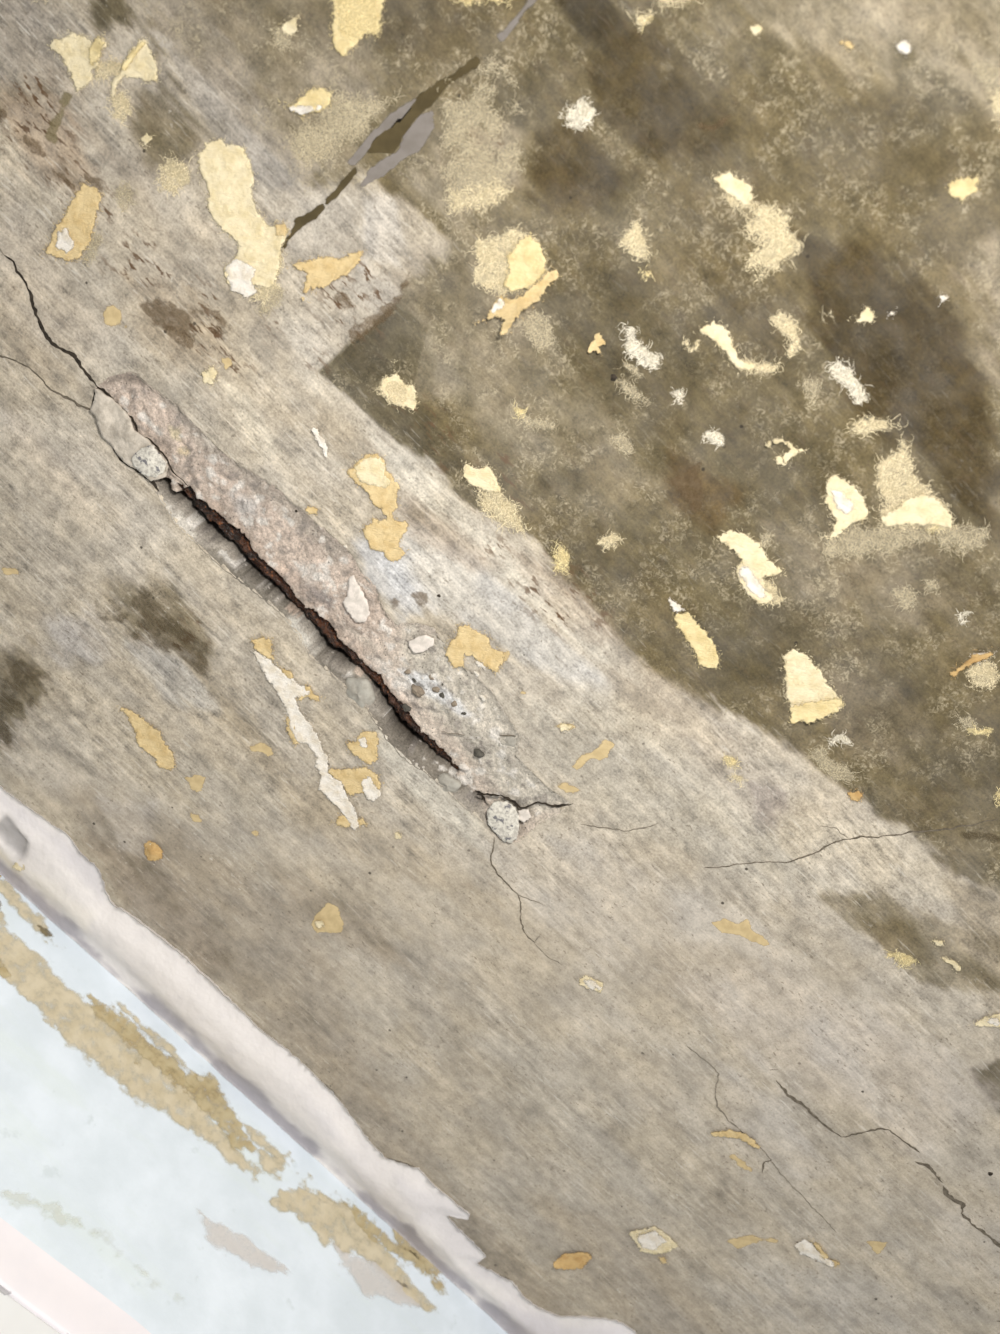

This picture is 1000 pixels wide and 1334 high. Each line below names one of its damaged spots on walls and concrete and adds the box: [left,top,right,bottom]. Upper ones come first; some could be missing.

leakage [497,0,537,42]
leakage [281,168,357,248]
crack [0,249,188,491]
spalling [90,372,569,843]
crack [477,793,658,832]
peeling [0,786,636,1334]
crack [687,1046,836,1232]
crack [772,1069,1000,1248]